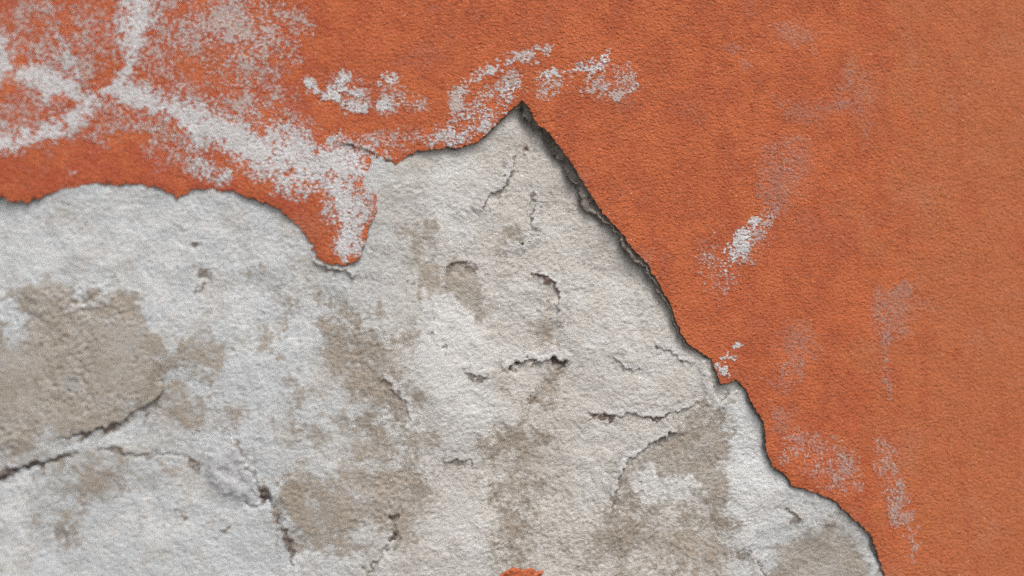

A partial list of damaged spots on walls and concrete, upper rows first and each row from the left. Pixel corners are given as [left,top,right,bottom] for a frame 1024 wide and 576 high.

peeling [66,1,112,55]
peeling [273,1,315,38]
peeling [262,80,286,111]
peeling [446,58,526,136]
peeling [280,105,316,126]
peeling [362,126,410,148]
peeling [431,124,474,147]
leakage [753,212,776,243]
leakage [401,213,445,299]
crack [0,445,201,480]
leakage [577,500,734,576]